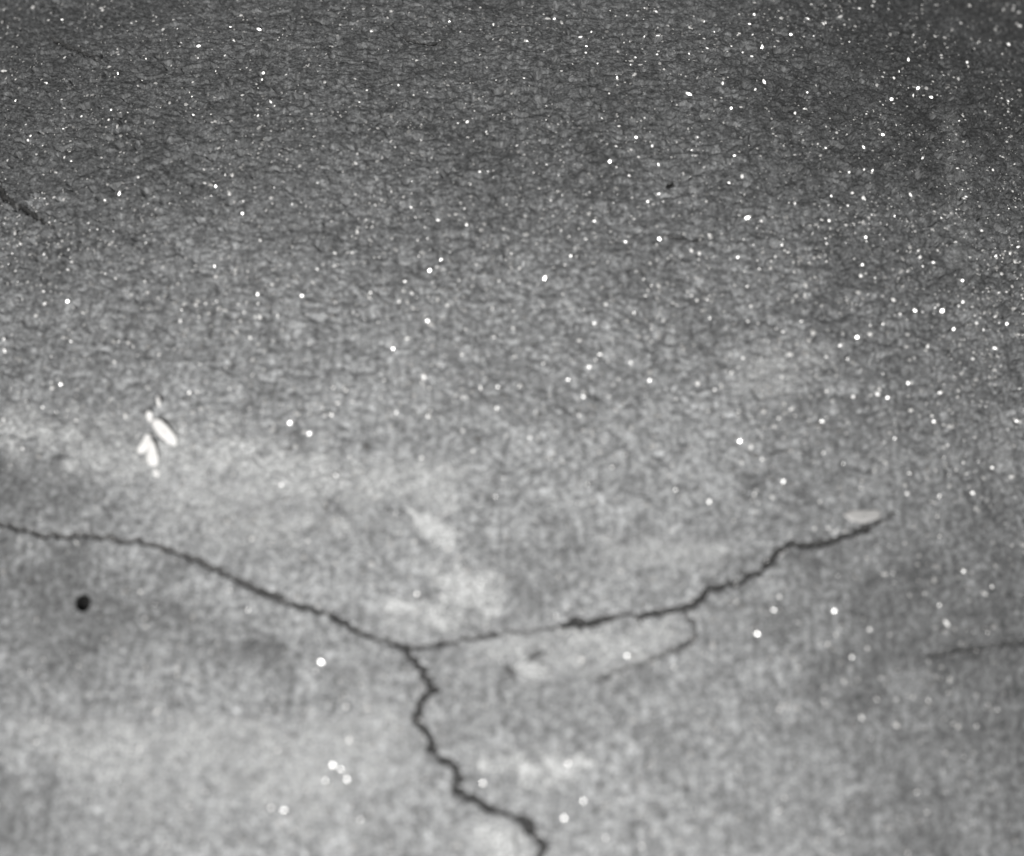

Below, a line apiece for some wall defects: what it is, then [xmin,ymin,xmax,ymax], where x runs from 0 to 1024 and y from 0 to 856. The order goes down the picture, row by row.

crack [0,511,894,856]